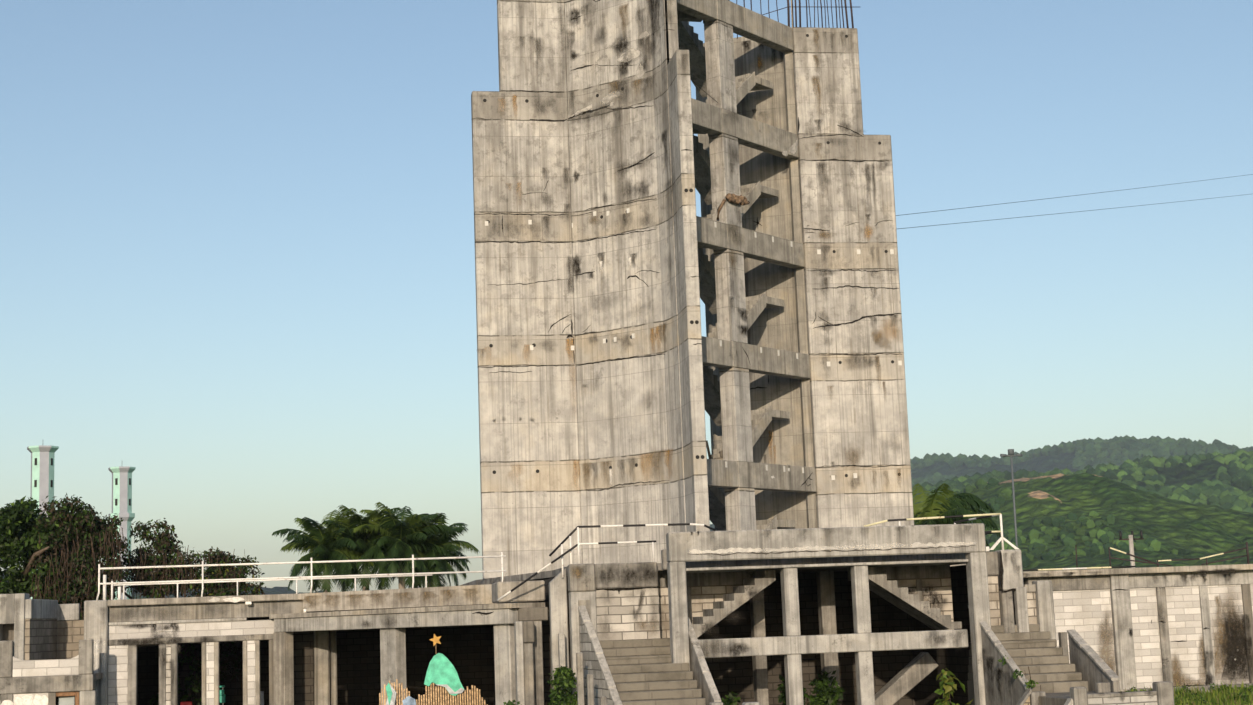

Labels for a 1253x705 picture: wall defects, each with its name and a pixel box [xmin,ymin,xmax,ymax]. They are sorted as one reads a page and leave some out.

crack [618,149,692,171]
crack [475,181,657,243]
crack [490,278,565,286]
crack [807,269,902,355]
crack [481,314,662,373]
water stain [1100,616,1114,670]
water stain [1172,597,1253,687]